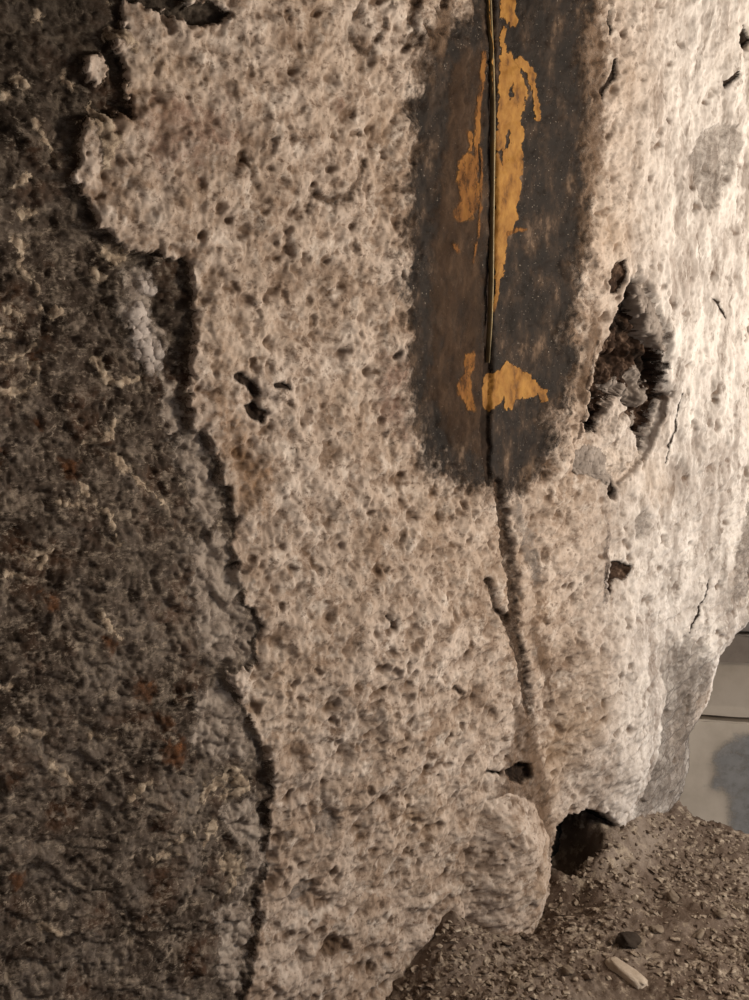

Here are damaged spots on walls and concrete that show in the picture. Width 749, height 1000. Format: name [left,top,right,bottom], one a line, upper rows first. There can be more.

flaking render [0,0,275,1000]
corrosion [454,0,541,312]
leakage [398,0,607,506]
corrosion [457,352,548,412]
crack [479,259,553,717]
spalling [572,260,676,495]
spalling [550,818,565,863]
spalling [583,809,612,825]